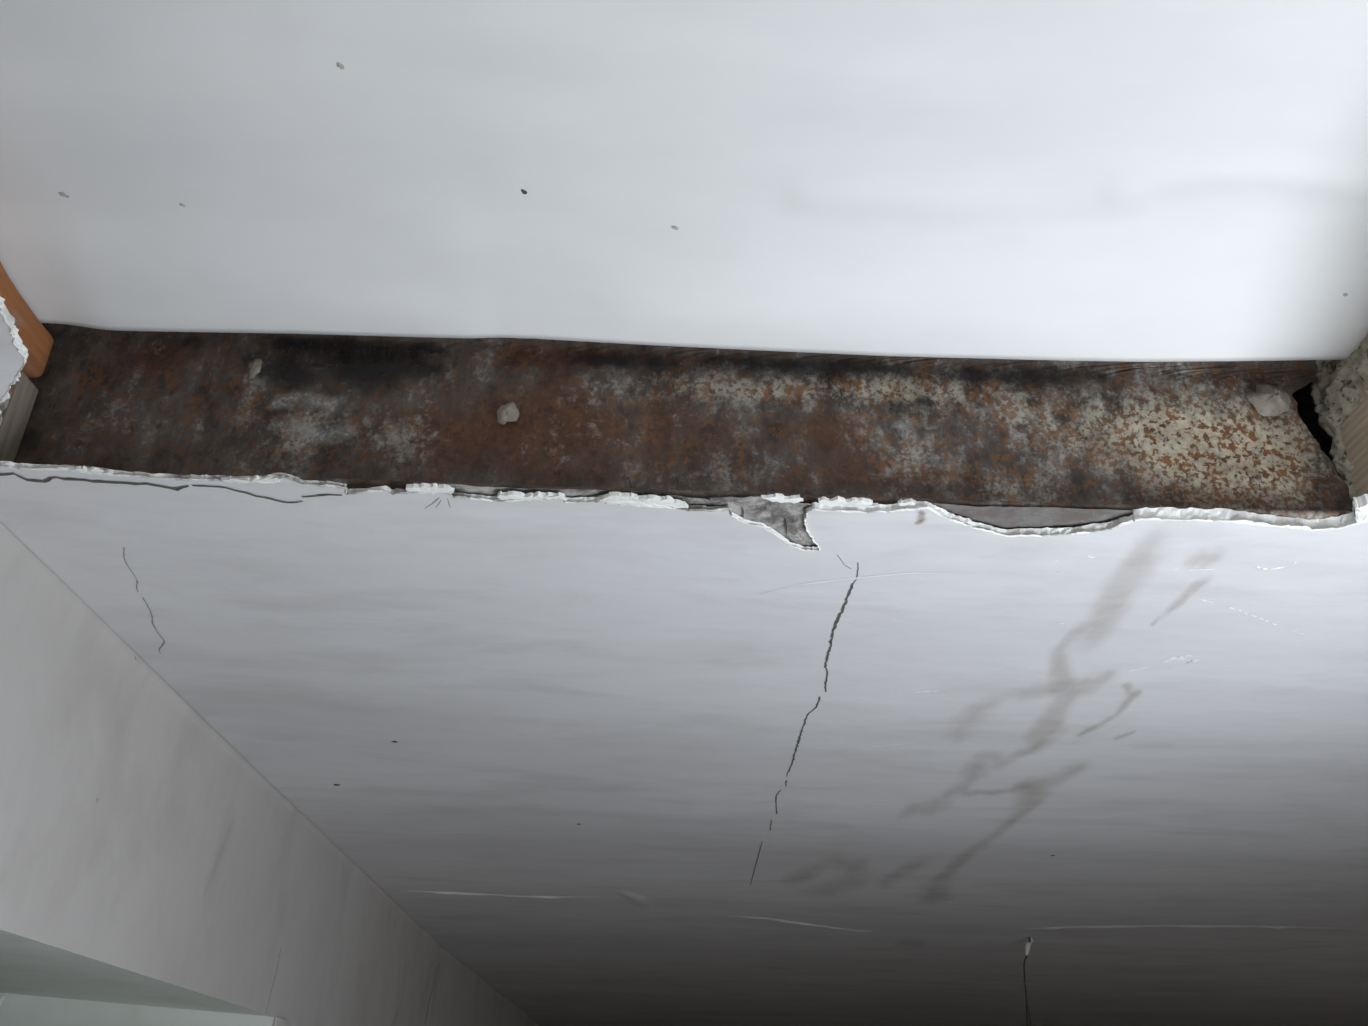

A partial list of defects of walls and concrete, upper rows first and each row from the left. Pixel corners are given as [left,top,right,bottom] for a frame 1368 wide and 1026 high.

flaking render [0,297,28,425]
flaking render [0,461,1368,551]
crack [123,549,165,659]
crack [750,555,859,885]